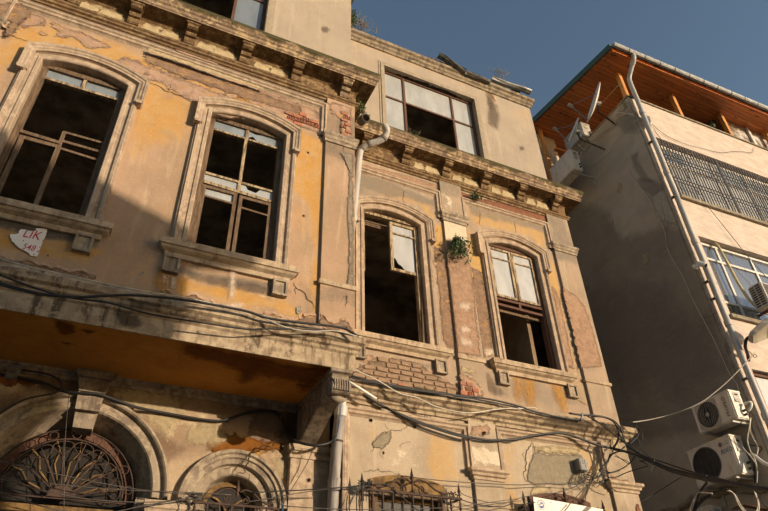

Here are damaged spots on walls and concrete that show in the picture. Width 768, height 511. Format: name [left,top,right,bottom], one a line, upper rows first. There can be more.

peeling [52,1,124,27]
peeling [141,23,179,40]
peeling [196,41,235,60]
flaking render [115,47,320,133]
leakage [487,92,498,127]
leakage [55,320,94,344]
leakage [117,298,160,327]
spalling [552,286,602,369]
leakage [184,344,331,389]
flaking render [353,354,484,397]
flaking render [207,412,285,457]
crack [233,431,282,484]